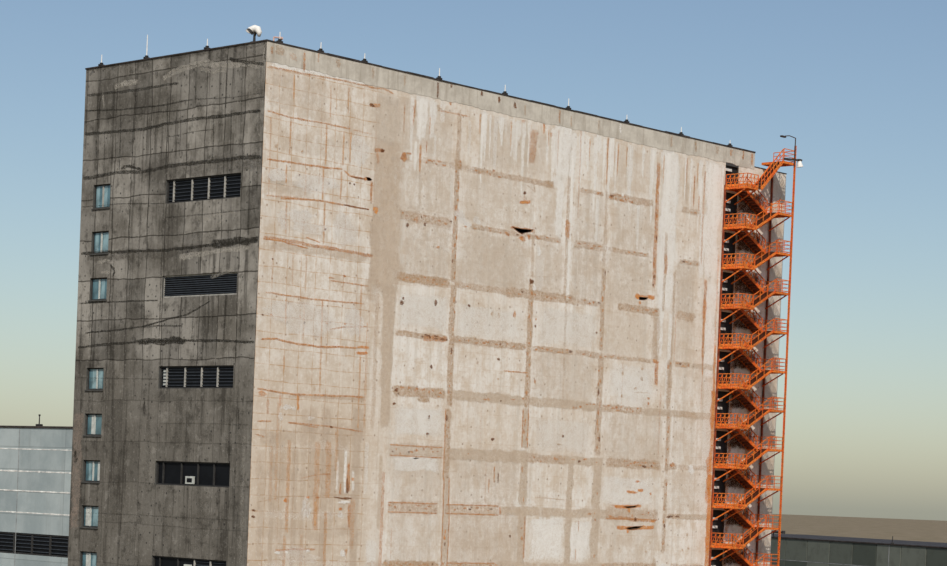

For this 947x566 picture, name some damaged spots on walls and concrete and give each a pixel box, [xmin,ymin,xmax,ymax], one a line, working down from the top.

leakage [89,42,374,225]
corrosion [299,431,356,566]
peeling [528,517,590,562]
peeling [600,475,655,533]